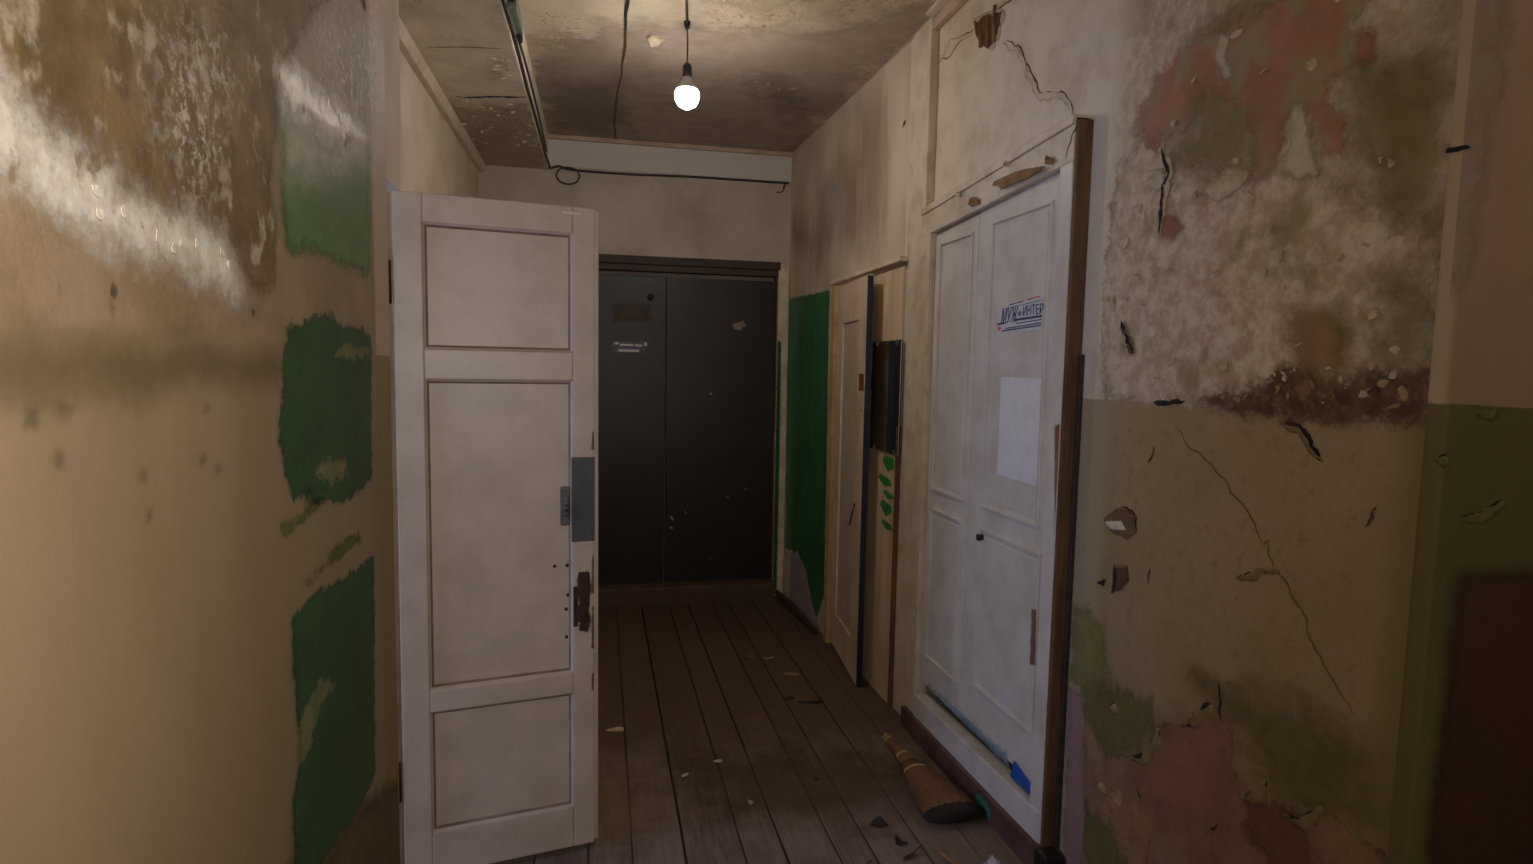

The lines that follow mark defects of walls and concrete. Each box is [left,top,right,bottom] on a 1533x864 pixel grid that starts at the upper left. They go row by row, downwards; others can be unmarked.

crack [938,0,1078,156]
spalling [1100,0,1440,427]
peeling [1097,564,1129,593]
peeling [1104,506,1137,539]
crack [1148,398,1353,714]